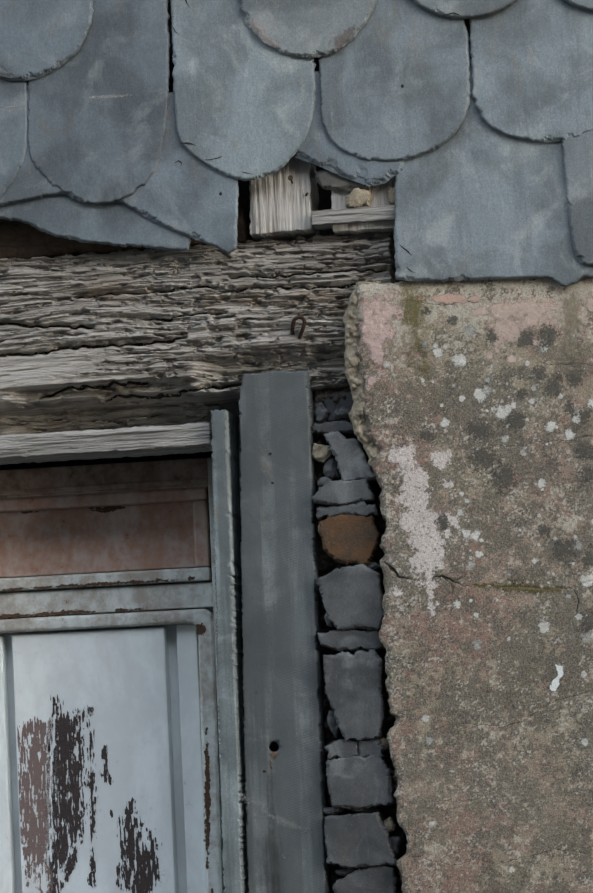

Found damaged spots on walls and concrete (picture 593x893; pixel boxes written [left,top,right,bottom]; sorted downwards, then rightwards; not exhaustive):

crack [386,563,579,615]
peeling [17,694,112,893]
peeling [110,797,162,893]
corrosion [203,727,211,871]